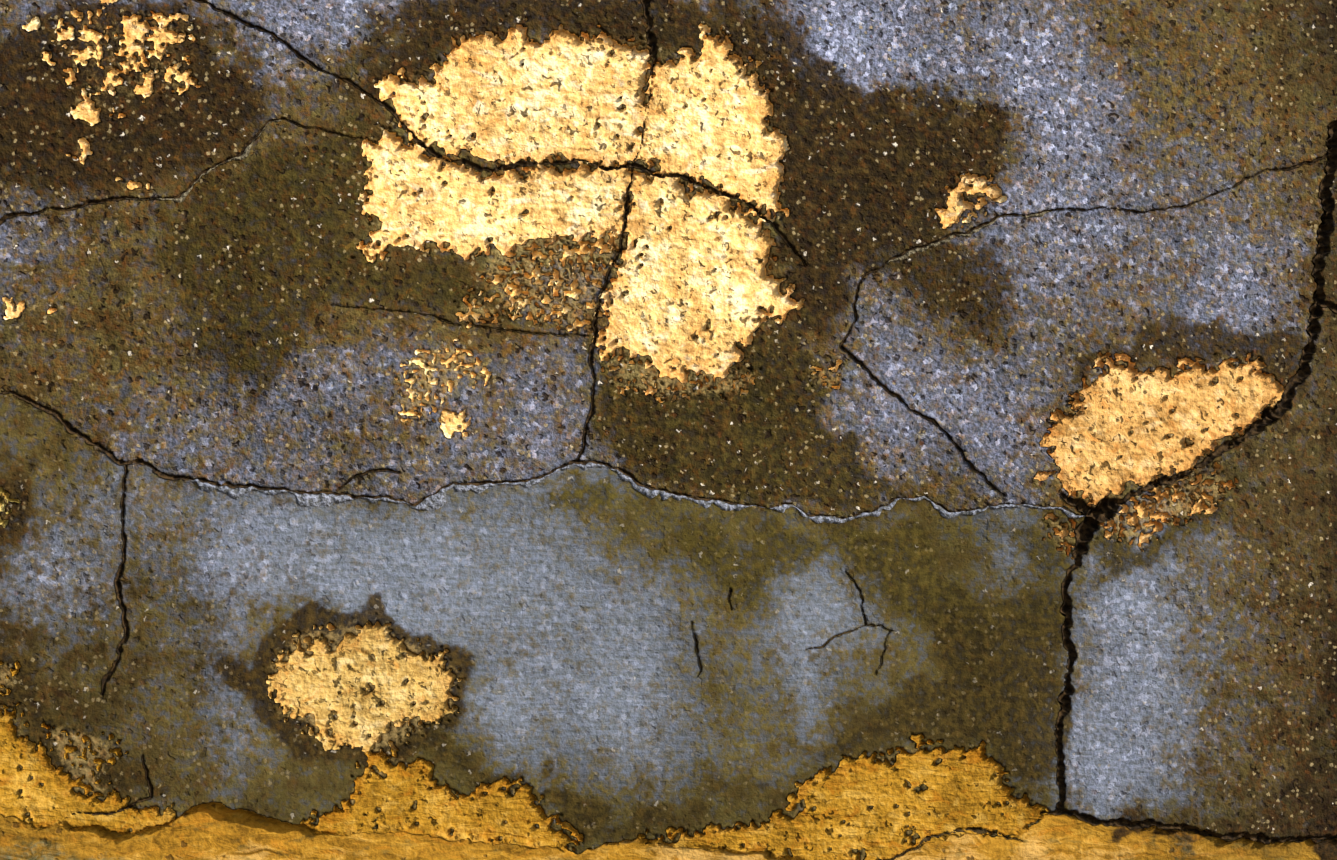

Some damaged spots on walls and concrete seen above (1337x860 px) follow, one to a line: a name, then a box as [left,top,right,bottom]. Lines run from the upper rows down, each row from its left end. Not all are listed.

flaking render [22,0,201,165]
crack [0,0,1084,524]
flaking render [356,18,805,438]
crack [72,755,153,815]
crack [101,465,129,695]
flaking render [266,621,583,852]
leakage [530,446,629,520]
leakage [211,489,1254,860]
flaking render [638,734,1049,860]
crack [805,570,892,675]
crack [840,122,1337,844]
flaking render [1034,352,1285,552]